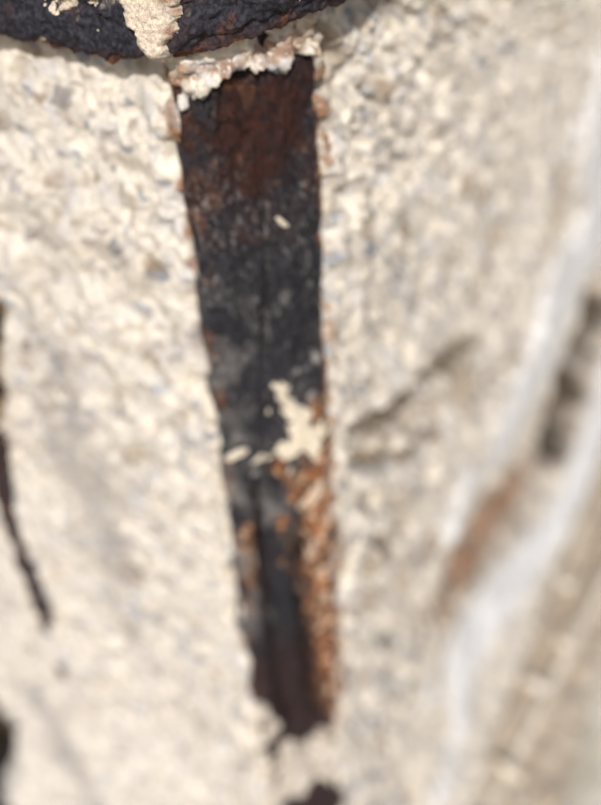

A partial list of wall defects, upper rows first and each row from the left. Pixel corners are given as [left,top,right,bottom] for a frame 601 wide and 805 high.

rust [165,65,196,88]
rust [312,94,330,119]
spalling [0,35,254,805]
rust [269,393,342,506]
spalling [314,0,601,805]
rust [238,523,257,591]